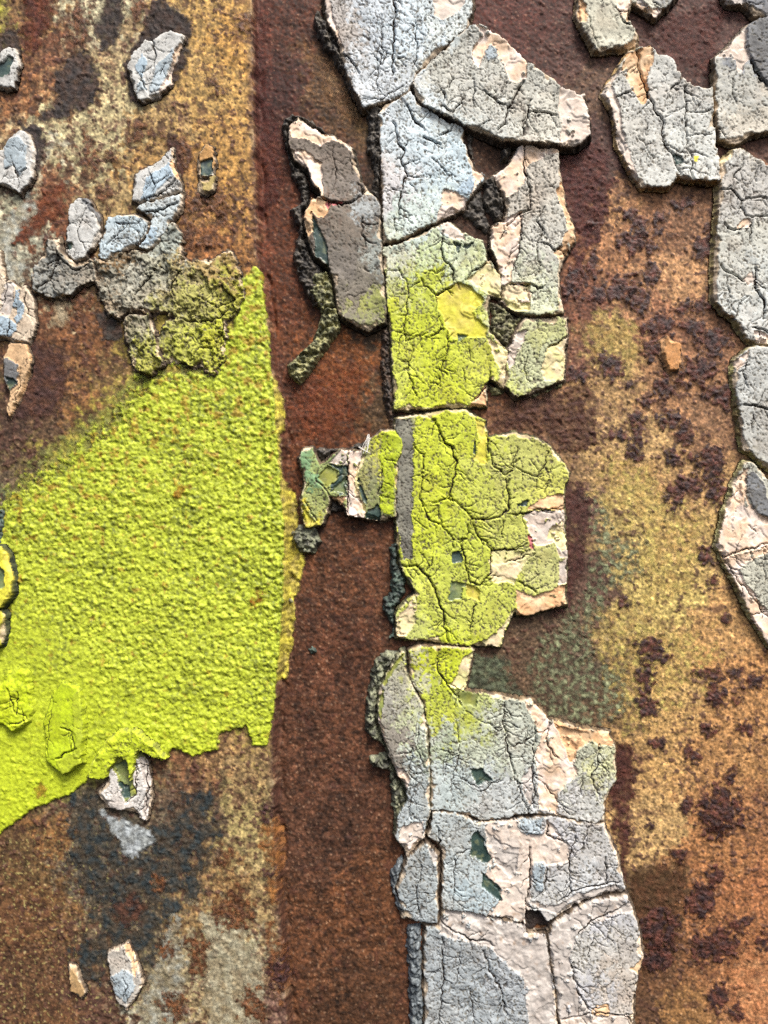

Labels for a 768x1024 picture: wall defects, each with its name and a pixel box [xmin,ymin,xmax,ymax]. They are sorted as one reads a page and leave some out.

peeling [127,30,188,106]
peeling [0,144,246,420]
corrosion [488,140,735,512]
peeling [282,0,768,1024]
corrosion [555,481,592,618]
peeling [0,668,170,821]
corrosion [632,631,675,717]
corrosion [692,664,768,712]
peeling [67,960,89,1000]
peeling [106,939,148,1011]
corrosion [212,844,295,1022]
corrosion [609,743,768,1023]